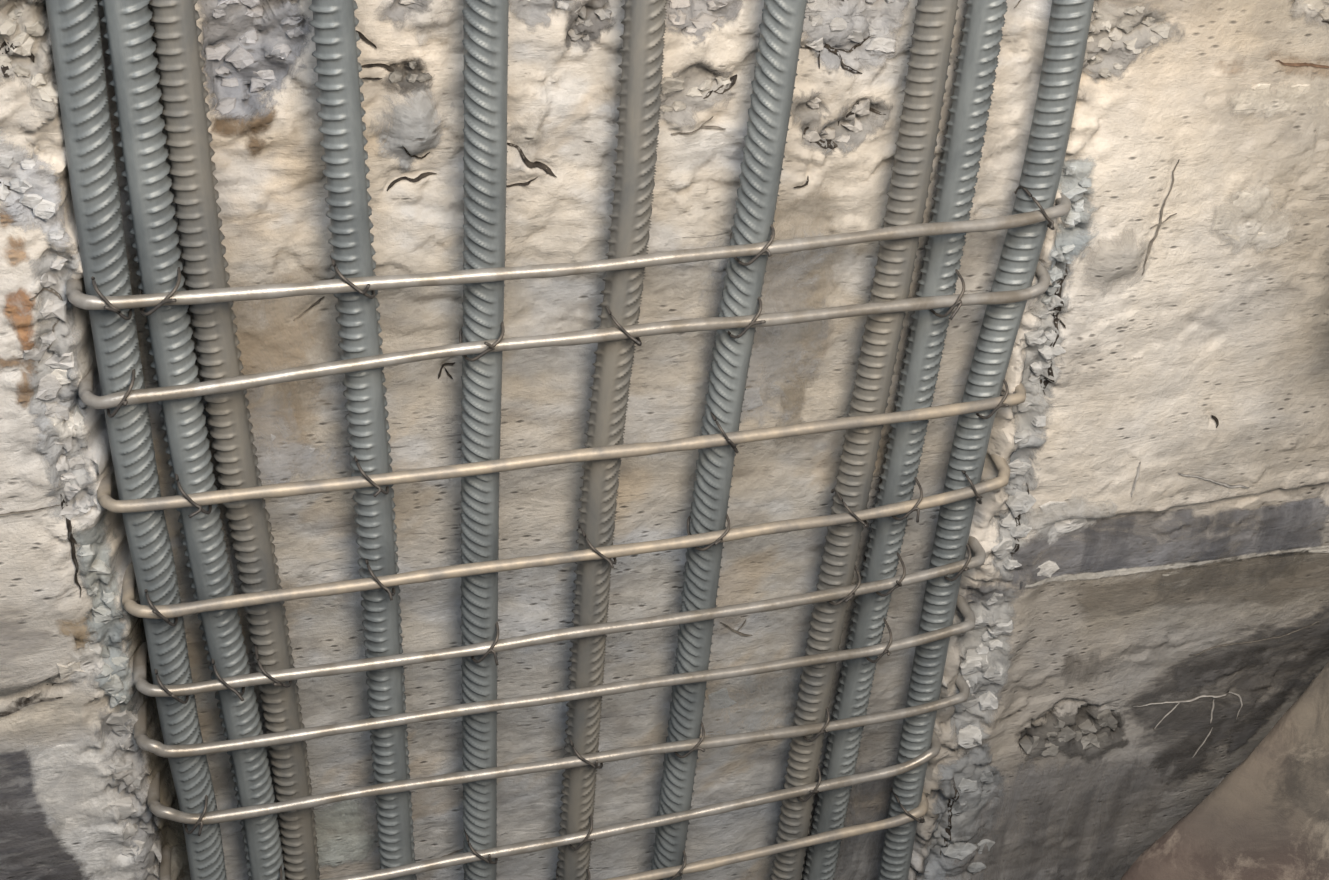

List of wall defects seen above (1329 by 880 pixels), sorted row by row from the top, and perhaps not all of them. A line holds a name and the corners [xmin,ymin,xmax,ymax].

spalling [0,0,61,119]
spalling [198,0,311,119]
spalling [803,0,909,72]
rust [0,211,26,265]
crack [387,146,437,191]
crack [506,143,556,187]
crack [1142,159,1180,275]
rust [0,289,37,407]
spalling [0,137,163,880]
spalling [918,159,1329,880]
water stain [1010,497,1329,614]
water stain [946,606,1329,880]